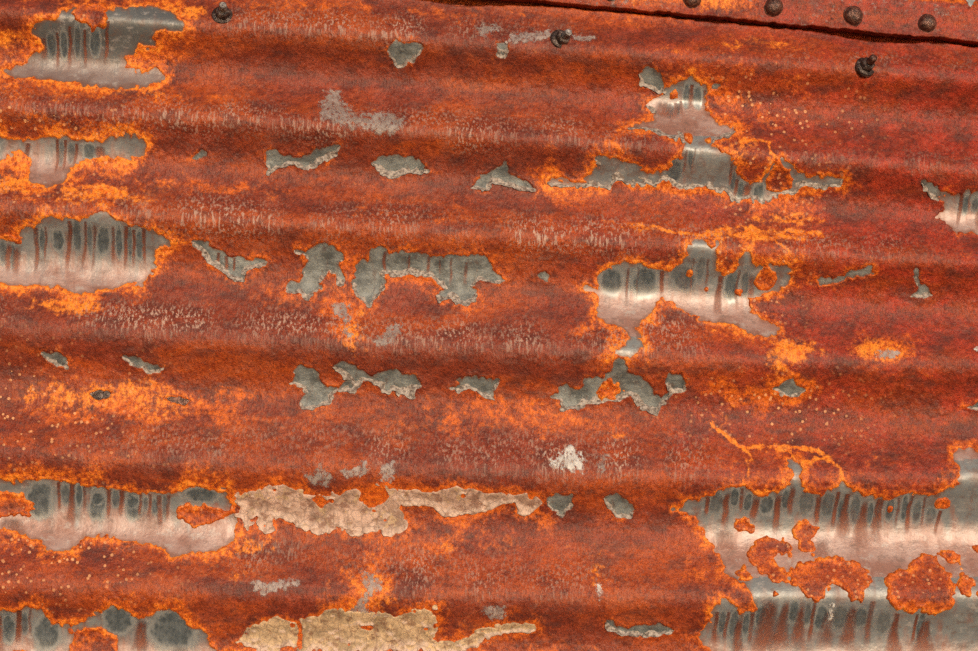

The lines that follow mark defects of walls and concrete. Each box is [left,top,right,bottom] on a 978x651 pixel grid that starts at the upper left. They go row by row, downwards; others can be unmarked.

peeling [3,2,184,90]
peeling [0,132,146,188]
peeling [547,66,843,204]
peeling [921,179,978,235]
peeling [0,211,171,295]
peeling [286,243,505,337]
peeling [550,238,792,416]
peeling [289,361,422,411]
peeling [0,460,573,558]
peeling [671,447,978,651]
peeling [0,605,216,651]
peeling [235,605,536,651]